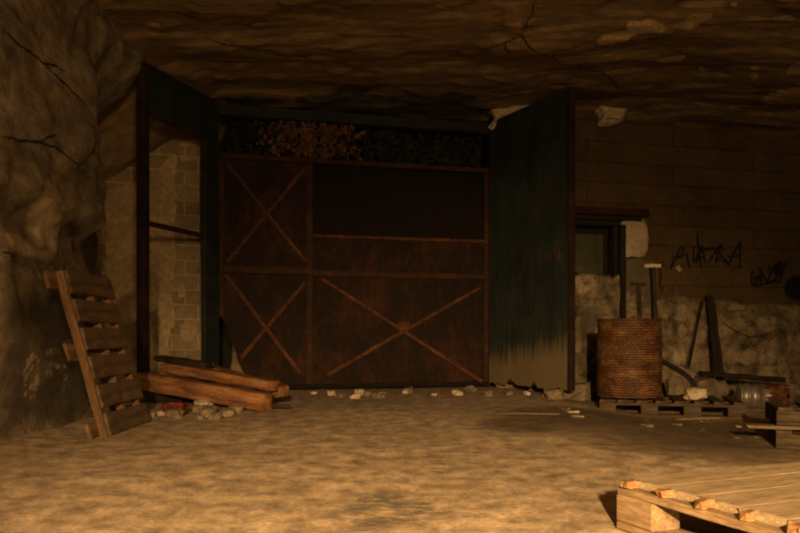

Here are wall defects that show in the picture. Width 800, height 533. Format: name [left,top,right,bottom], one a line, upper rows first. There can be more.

crack [2,29,93,116]
crack [434,1,661,105]
spalling [596,12,713,45]
crack [2,134,86,174]